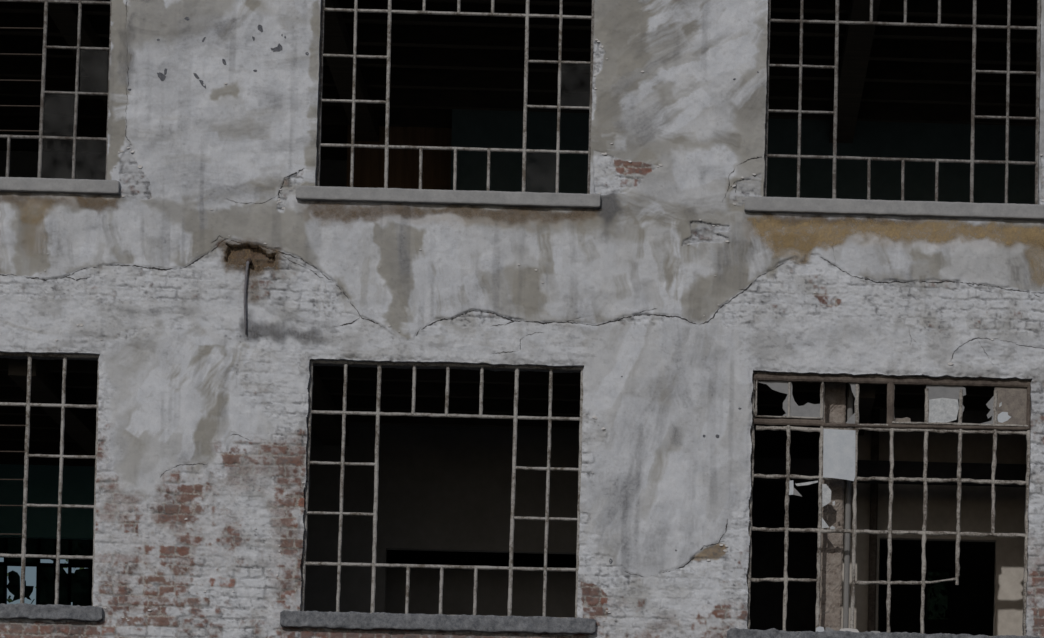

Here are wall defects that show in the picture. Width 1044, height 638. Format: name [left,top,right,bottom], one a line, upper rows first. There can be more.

peeling [592,0,663,195]
peeling [16,207,51,276]
peeling [182,209,307,272]
crack [0,235,378,326]
crack [416,247,1040,353]
peeling [814,292,841,308]
crack [951,338,1044,360]
peeling [0,438,305,638]
spalling [693,544,728,561]